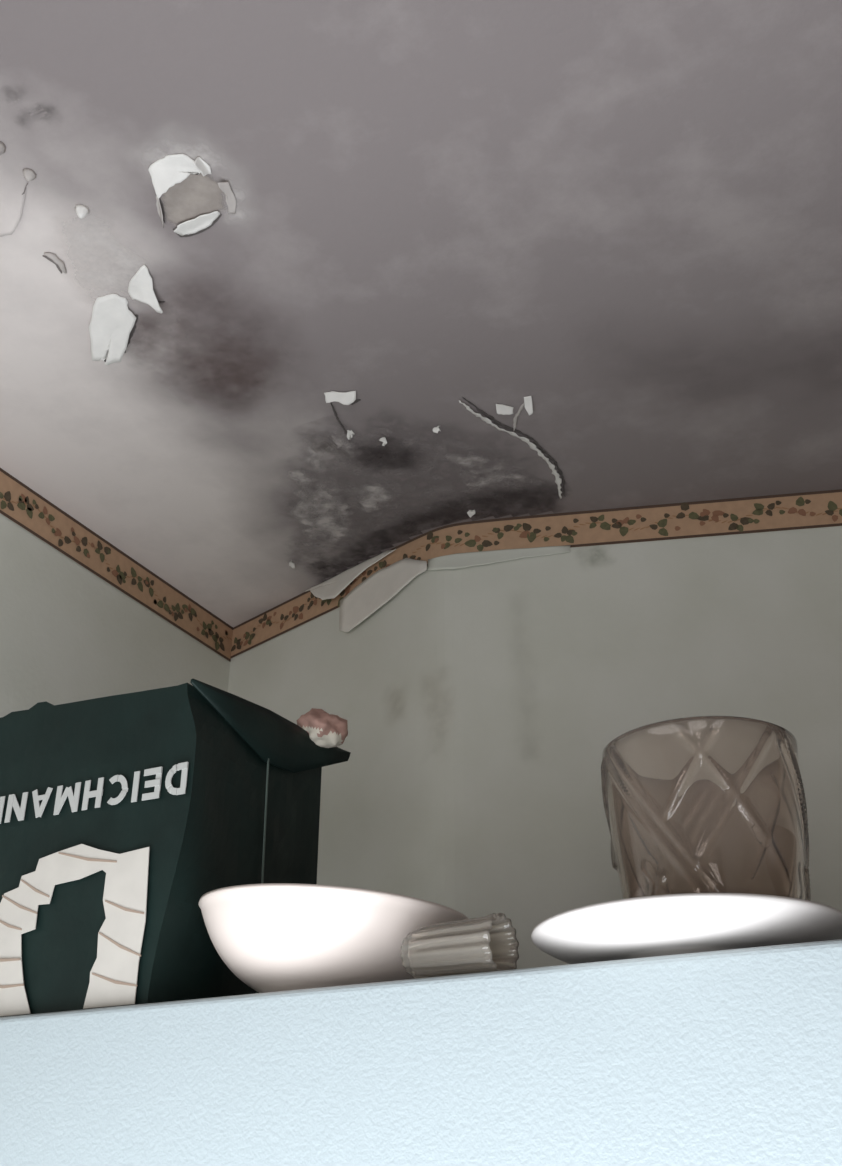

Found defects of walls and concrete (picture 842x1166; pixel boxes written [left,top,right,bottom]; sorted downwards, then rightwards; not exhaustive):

peeling [148,147,242,237]
peeling [69,218,165,365]
peeling [324,391,360,443]
crack [459,396,565,499]
damp [290,428,556,577]
peeling [304,549,396,600]